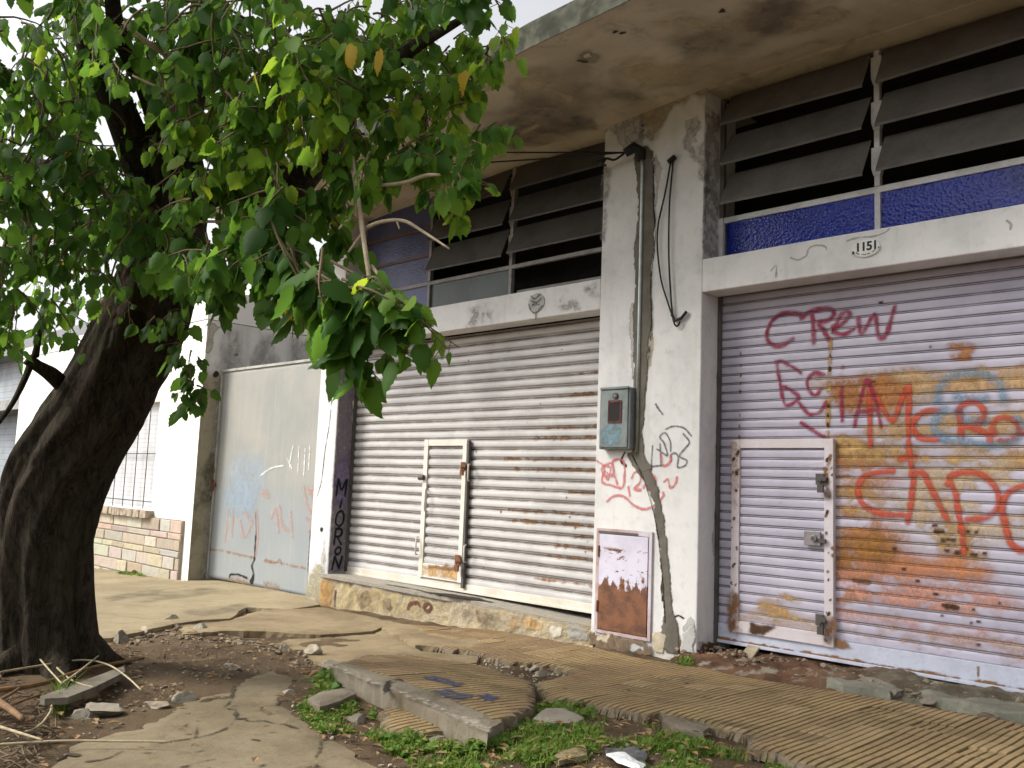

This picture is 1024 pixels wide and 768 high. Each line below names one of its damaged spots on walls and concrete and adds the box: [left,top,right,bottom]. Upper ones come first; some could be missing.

leakage [640,88,707,142]
corrosion [534,424,597,440]
corrosion [504,457,596,472]
corrosion [718,325,1024,679]
corrosion [423,564,457,580]
corrosion [500,509,595,562]
crack [620,451,684,654]
spalling [330,666,490,732]
crack [177,686,322,768]
crack [55,751,122,762]